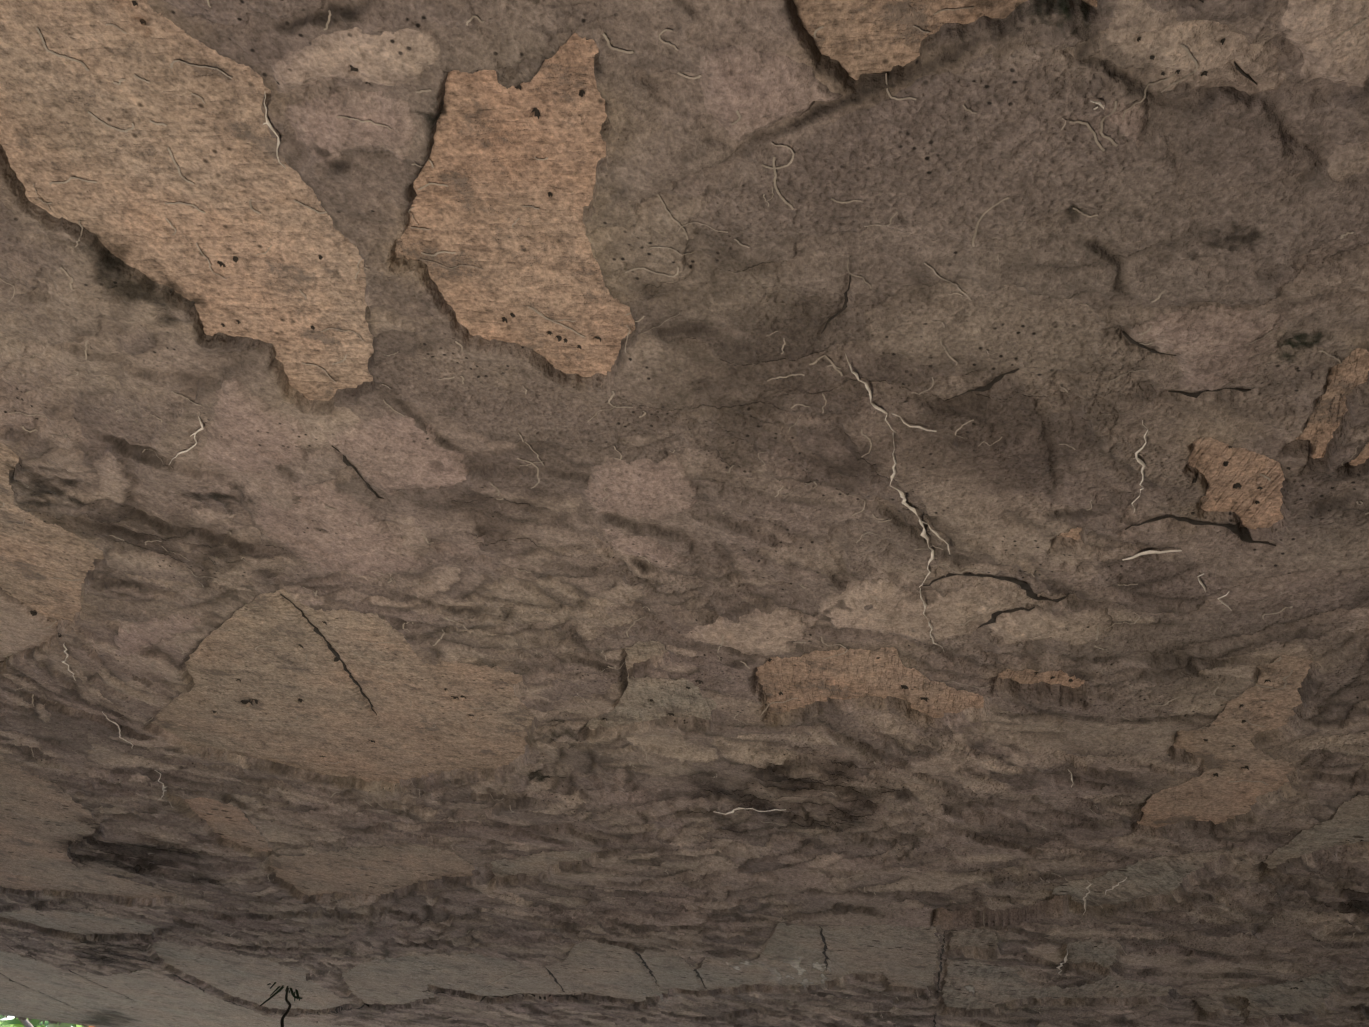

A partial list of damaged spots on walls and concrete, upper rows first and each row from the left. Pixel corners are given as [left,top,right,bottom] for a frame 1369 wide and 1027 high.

peeling [793,0,1028,80]
peeling [0,0,374,401]
peeling [395,33,635,377]
peeling [0,443,104,637]
peeling [1187,437,1290,529]
crack [280,594,377,716]
peeling [151,589,536,784]
peeling [1137,655,1313,829]
peeling [0,909,1172,1027]
crack [635,952,707,989]
crack [819,926,829,970]
crack [933,930,946,1027]